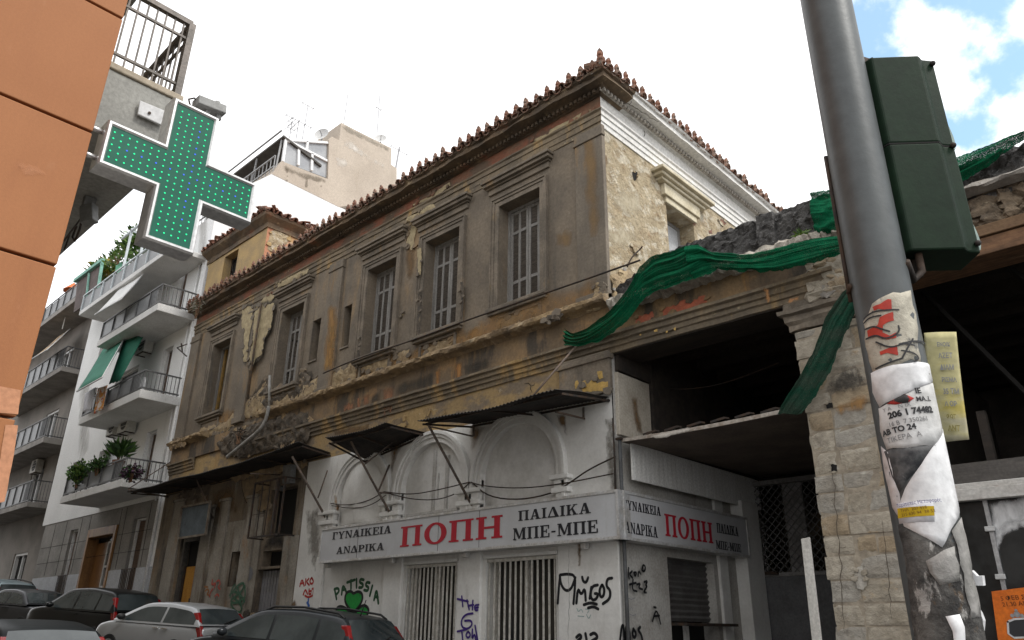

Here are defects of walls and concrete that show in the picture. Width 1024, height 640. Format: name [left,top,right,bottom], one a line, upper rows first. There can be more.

flaking render [404,182,450,333]
flaking render [168,366,318,451]
flaking render [241,269,309,371]
flaking render [332,336,453,386]
peeling [575,371,614,395]
peeling [633,295,711,336]